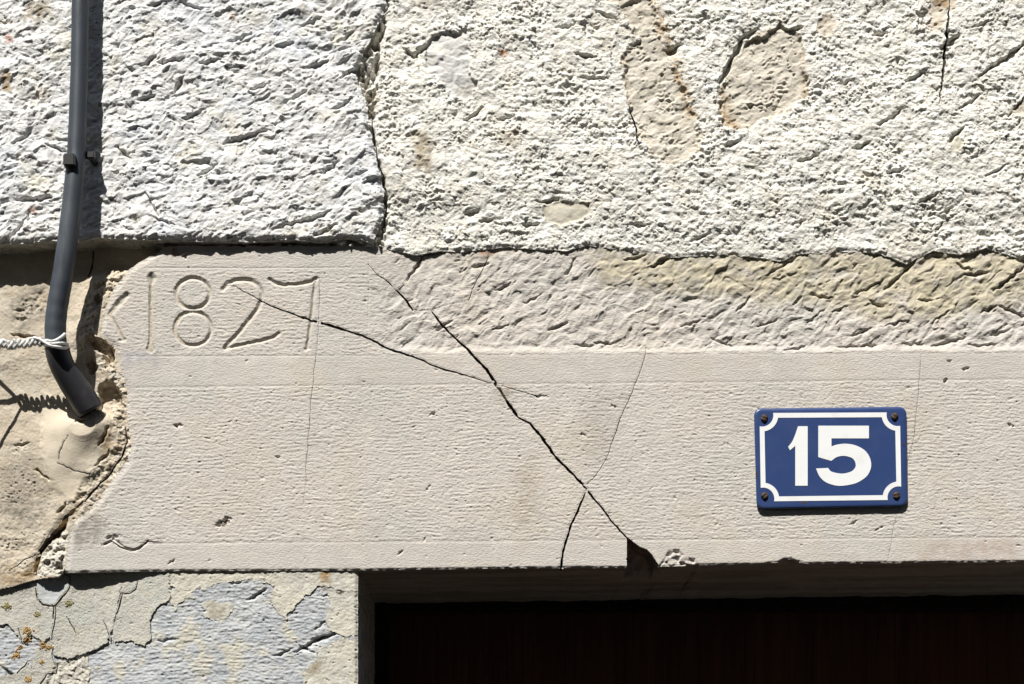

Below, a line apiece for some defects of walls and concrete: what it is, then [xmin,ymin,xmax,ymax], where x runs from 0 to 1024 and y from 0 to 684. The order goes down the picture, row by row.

crack [937,0,951,104]
peeling [0,254,176,684]
crack [224,257,647,571]
peeling [613,545,699,600]